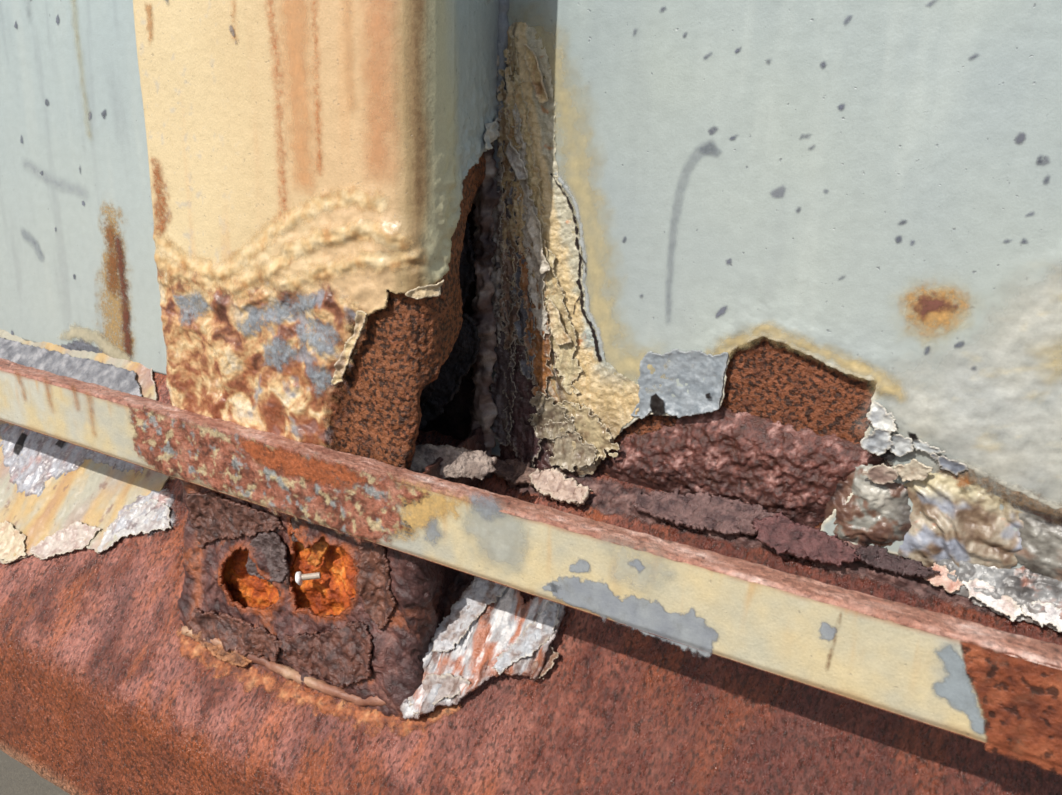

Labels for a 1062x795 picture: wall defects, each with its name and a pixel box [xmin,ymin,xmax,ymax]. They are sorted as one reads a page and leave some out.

peeling [0,327,158,400]
peeling [324,22,686,477]
crack [550,172,605,362]
corrosion [907,288,968,334]
peeling [0,420,171,564]
corrosion [128,404,460,543]
corrosion [492,458,593,507]
corrosion [596,407,884,568]
spalling [706,336,1062,632]
peeling [177,559,718,737]
peeling [819,622,837,641]
corrosion [961,642,1062,775]